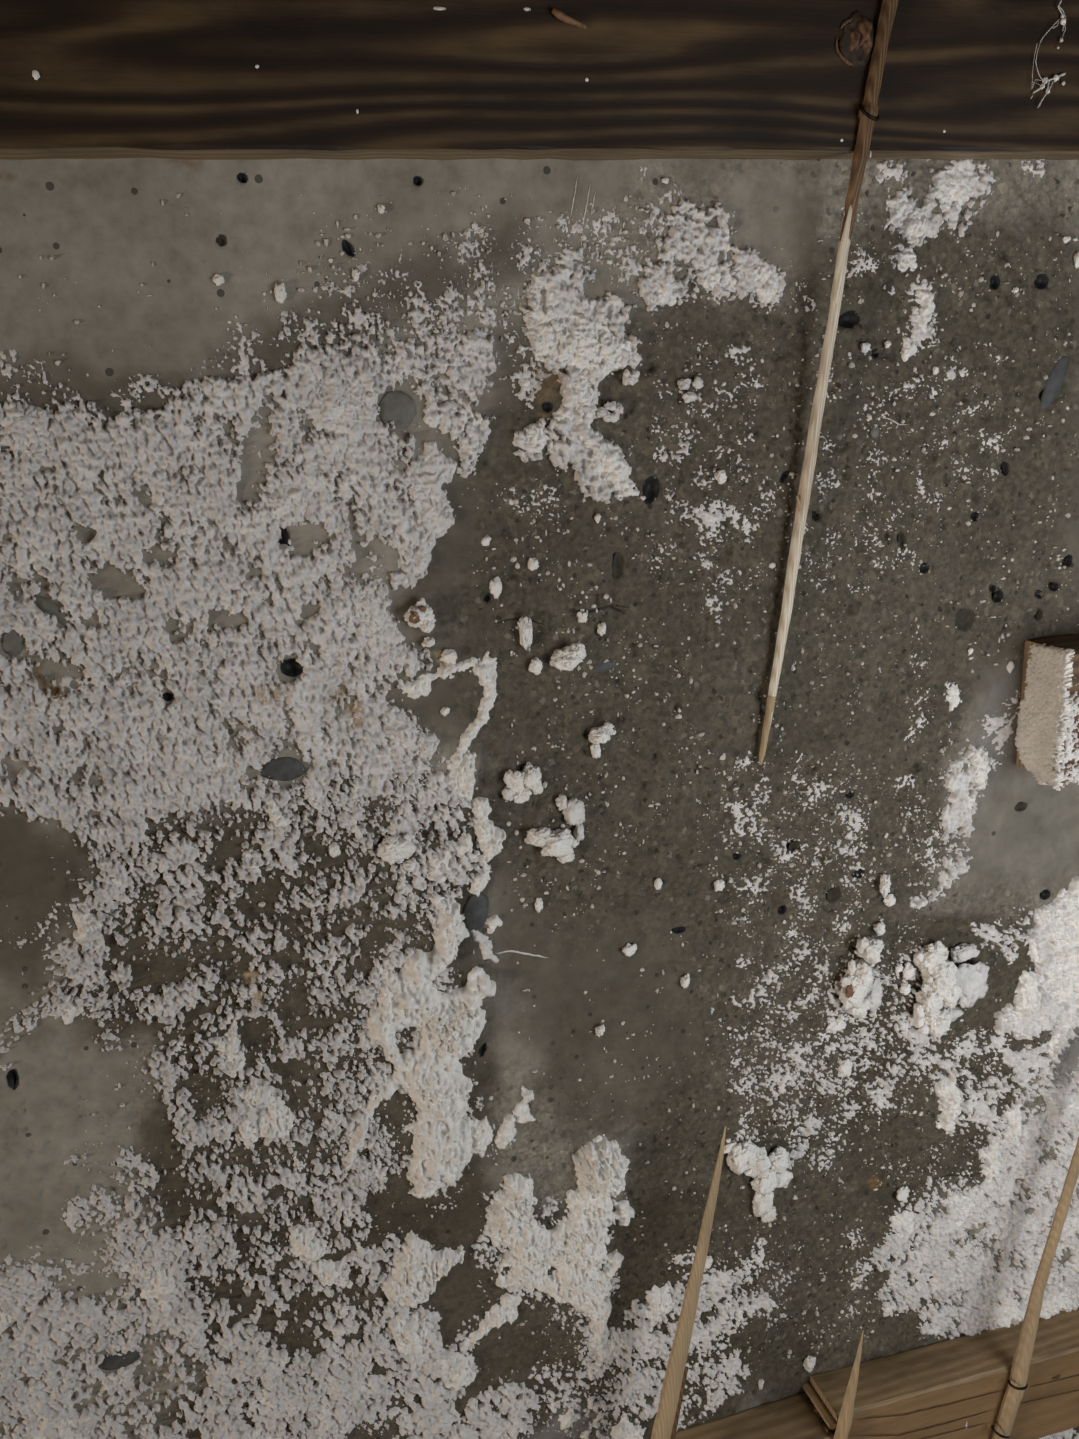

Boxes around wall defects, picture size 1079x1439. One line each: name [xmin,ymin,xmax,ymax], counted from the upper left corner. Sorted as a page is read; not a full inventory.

spalling [342,239,355,257]
peeling [830,205,860,329]
spalling [643,476,660,505]
spalling [990,585,1003,603]
peeling [528,657,543,675]
peeling [502,787,516,801]
peeling [555,794,585,842]
peeling [873,921,885,936]
peeling [865,963,915,1013]
peeling [946,1007,964,1022]
spalling [8,1069,19,1090]
peeling [776,1169,793,1189]